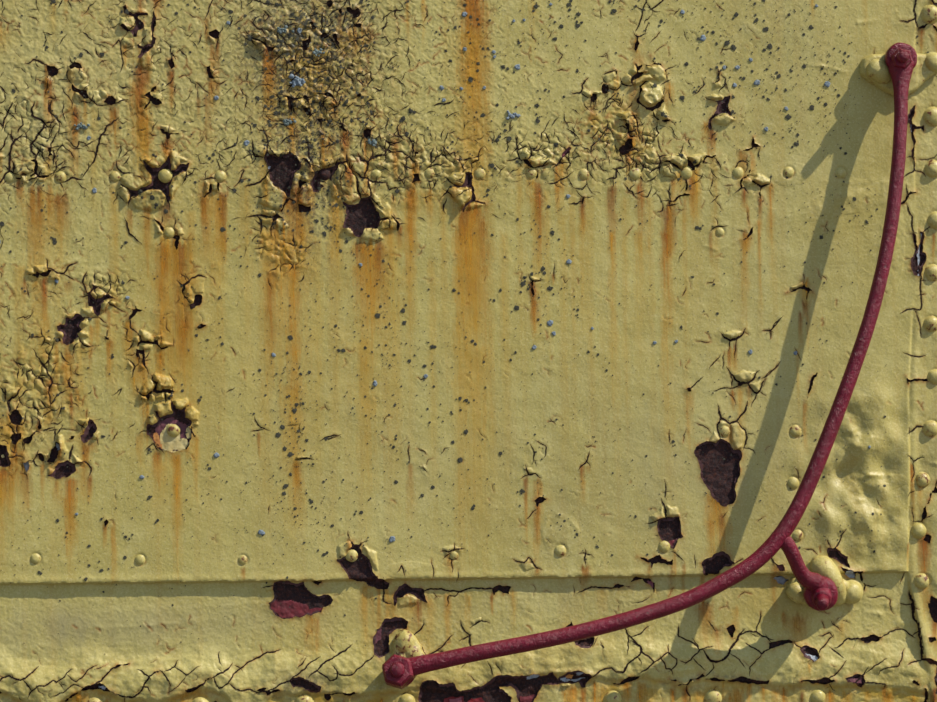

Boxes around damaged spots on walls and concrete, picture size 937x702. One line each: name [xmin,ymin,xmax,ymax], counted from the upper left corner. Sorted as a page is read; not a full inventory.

crack [901,157,926,204]
crack [0,0,772,479]
peeling [26,259,172,369]
peeling [38,412,99,479]
peeling [139,373,200,454]
peeling [694,400,756,518]
crack [0,623,375,702]
peeling [262,580,339,619]
peeling [336,534,427,658]
peeling [418,666,640,702]
crack [573,550,771,701]
crack [793,572,936,691]